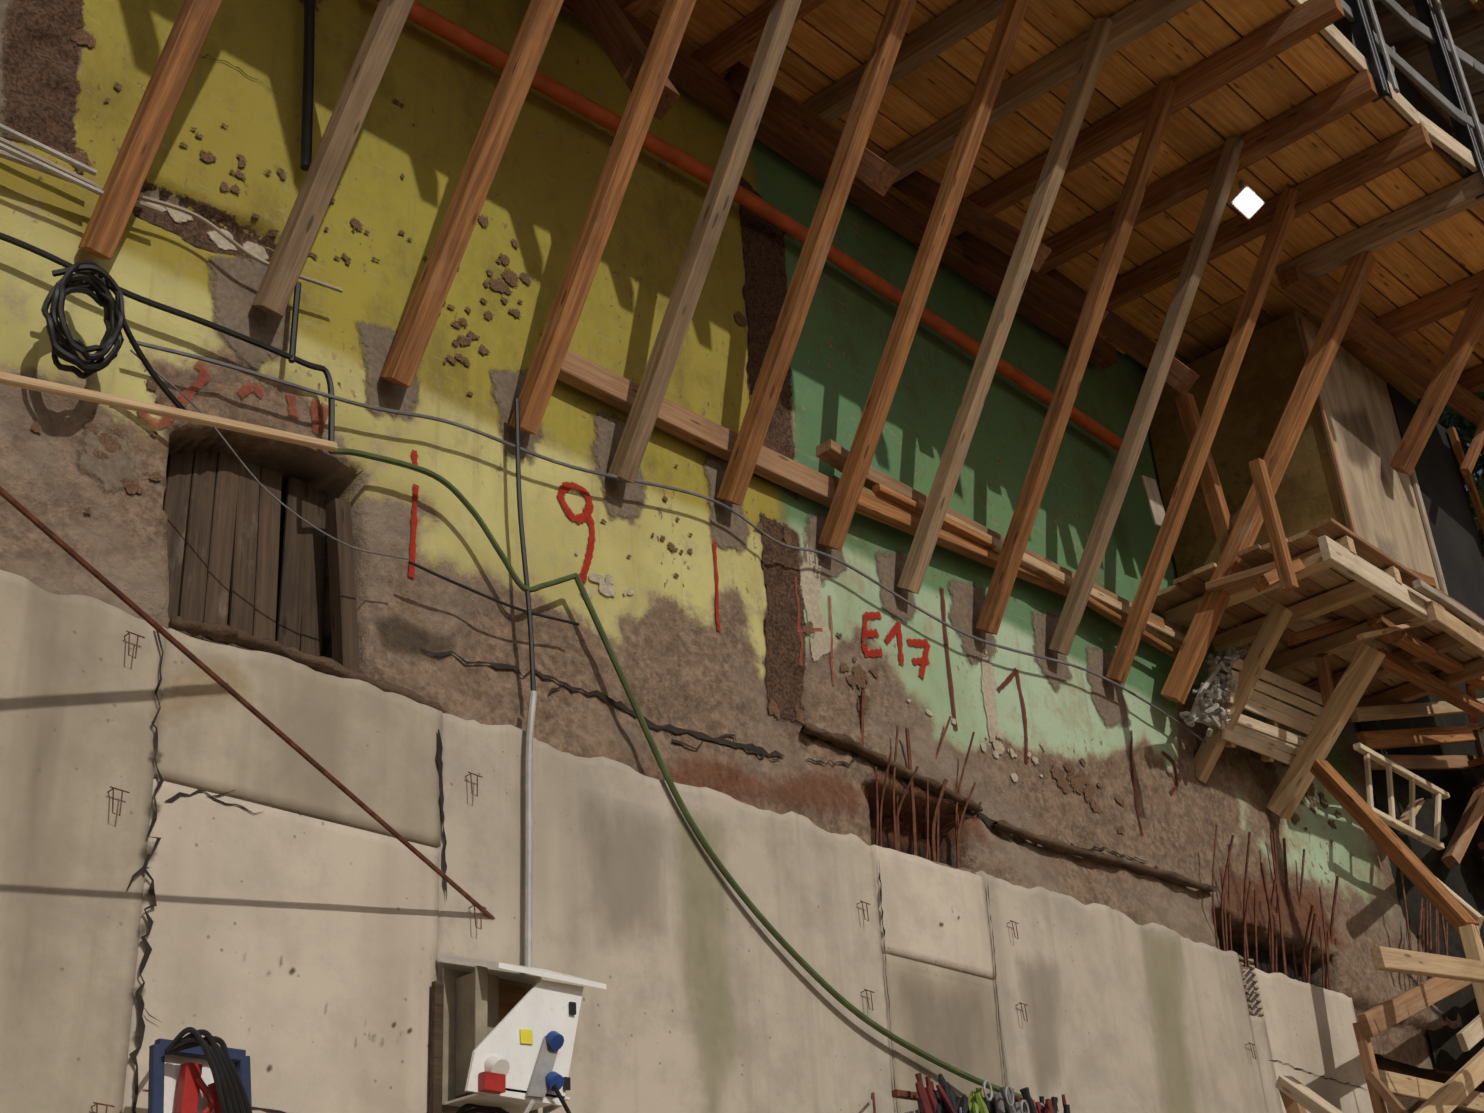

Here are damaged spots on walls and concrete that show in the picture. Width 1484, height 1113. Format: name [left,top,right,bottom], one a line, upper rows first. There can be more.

flaking render [0,0,97,175]
spalling [132,180,279,264]
flaking render [734,177,795,399]
flaking render [763,365,795,460]
crack [126,630,264,1113]
peeling [640,517,693,554]
flaking render [754,513,815,725]
crack [420,648,1216,901]
peeling [840,638,879,746]
spalling [861,725,1125,868]
spalling [1208,783,1342,1016]
crack [252,1105,286,1113]